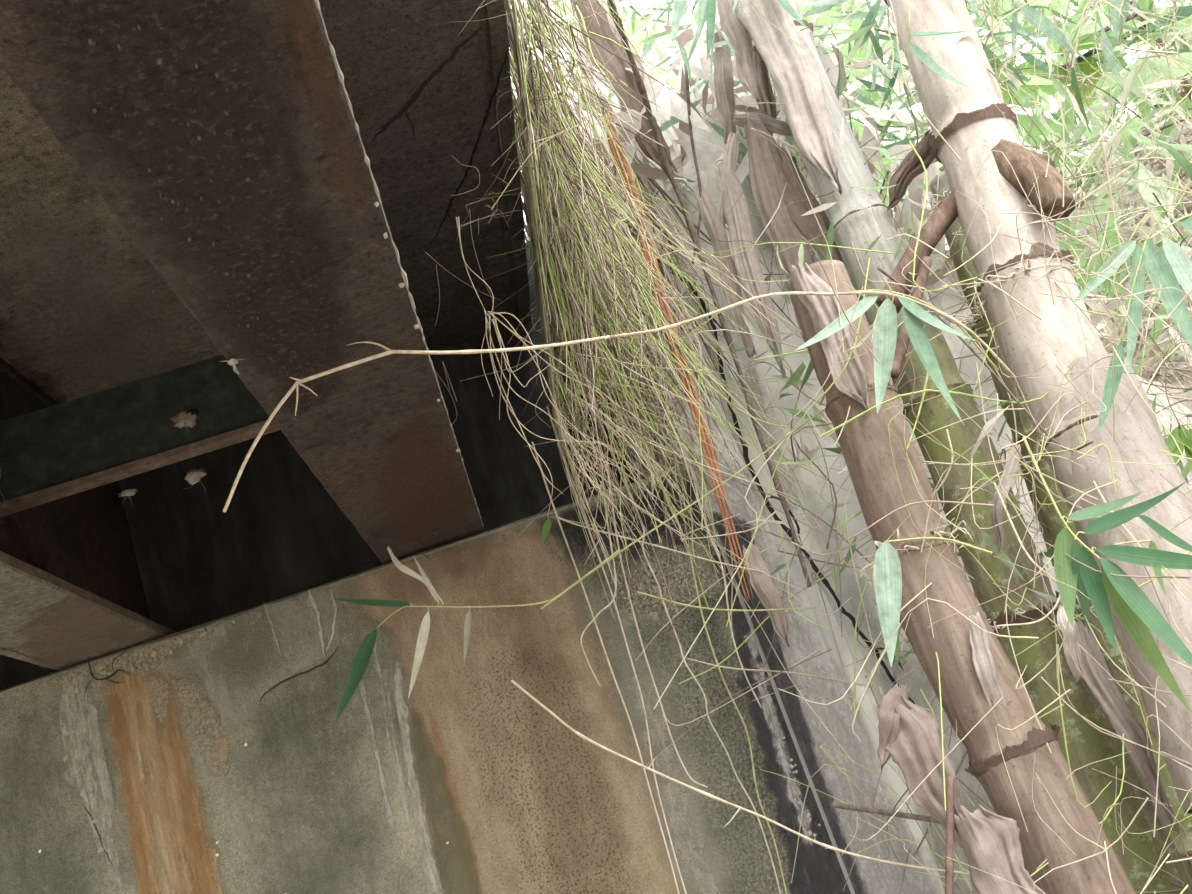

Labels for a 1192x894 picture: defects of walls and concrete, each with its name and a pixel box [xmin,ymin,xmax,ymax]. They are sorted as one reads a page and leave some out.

crack [370,27,482,145]
crack [424,44,510,253]
leakage [314,0,866,894]
rust [105,672,223,894]